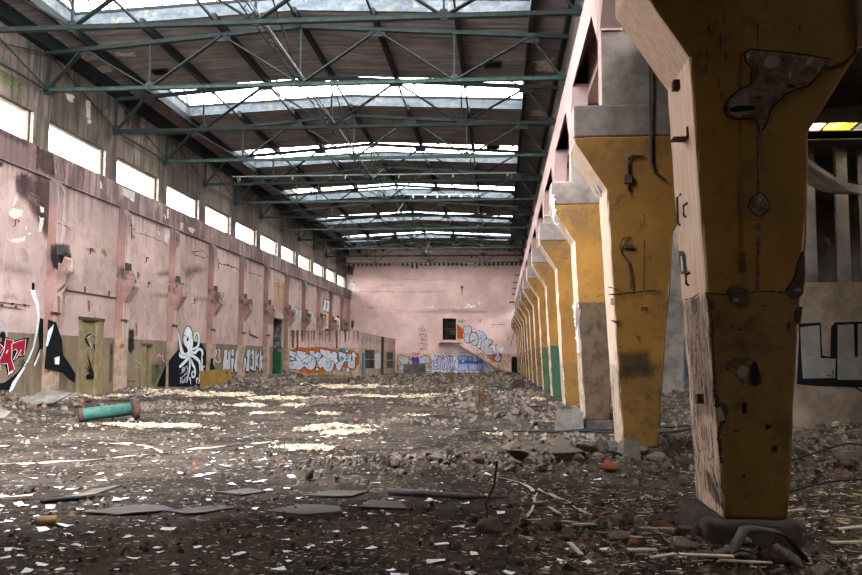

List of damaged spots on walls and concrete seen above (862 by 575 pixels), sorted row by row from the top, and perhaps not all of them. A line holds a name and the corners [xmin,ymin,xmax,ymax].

peeling [7,194,44,244]
spalling [785,251,806,329]